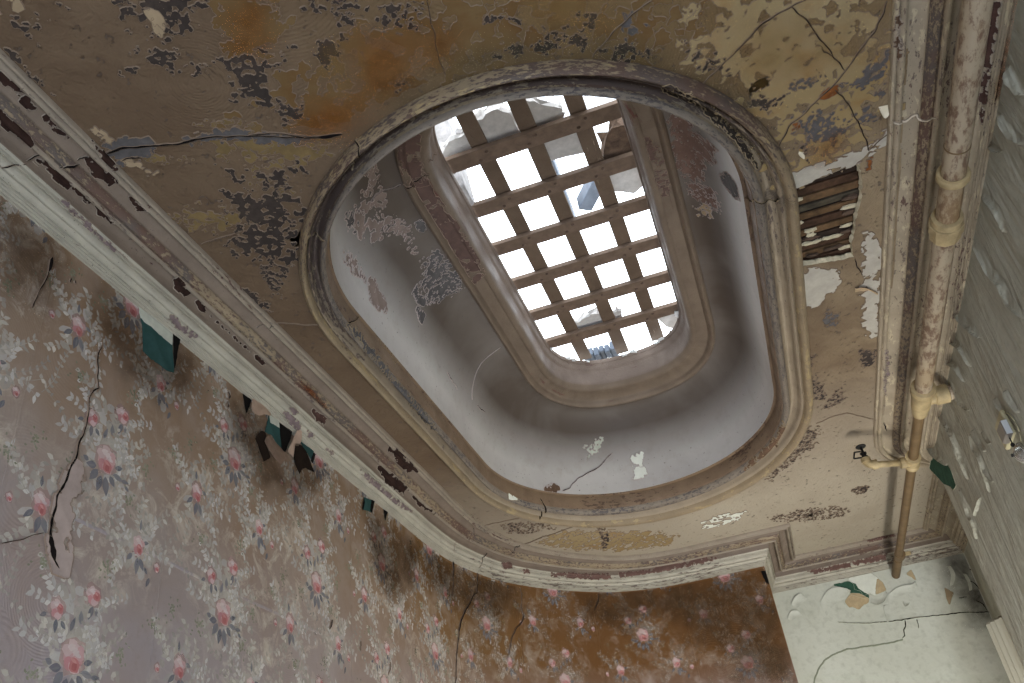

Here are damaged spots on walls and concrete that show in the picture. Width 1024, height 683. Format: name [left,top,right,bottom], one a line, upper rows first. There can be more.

crack [703,0,937,151]
crack [0,132,361,171]
peeling [84,0,425,315]
peeling [661,0,911,396]
flaking render [139,307,198,345]
peeling [172,276,267,366]
crack [2,345,103,569]
peeling [360,446,437,517]
peeling [927,414,994,539]
crack [452,453,612,683]
flaking render [807,553,919,610]
crack [813,569,990,683]